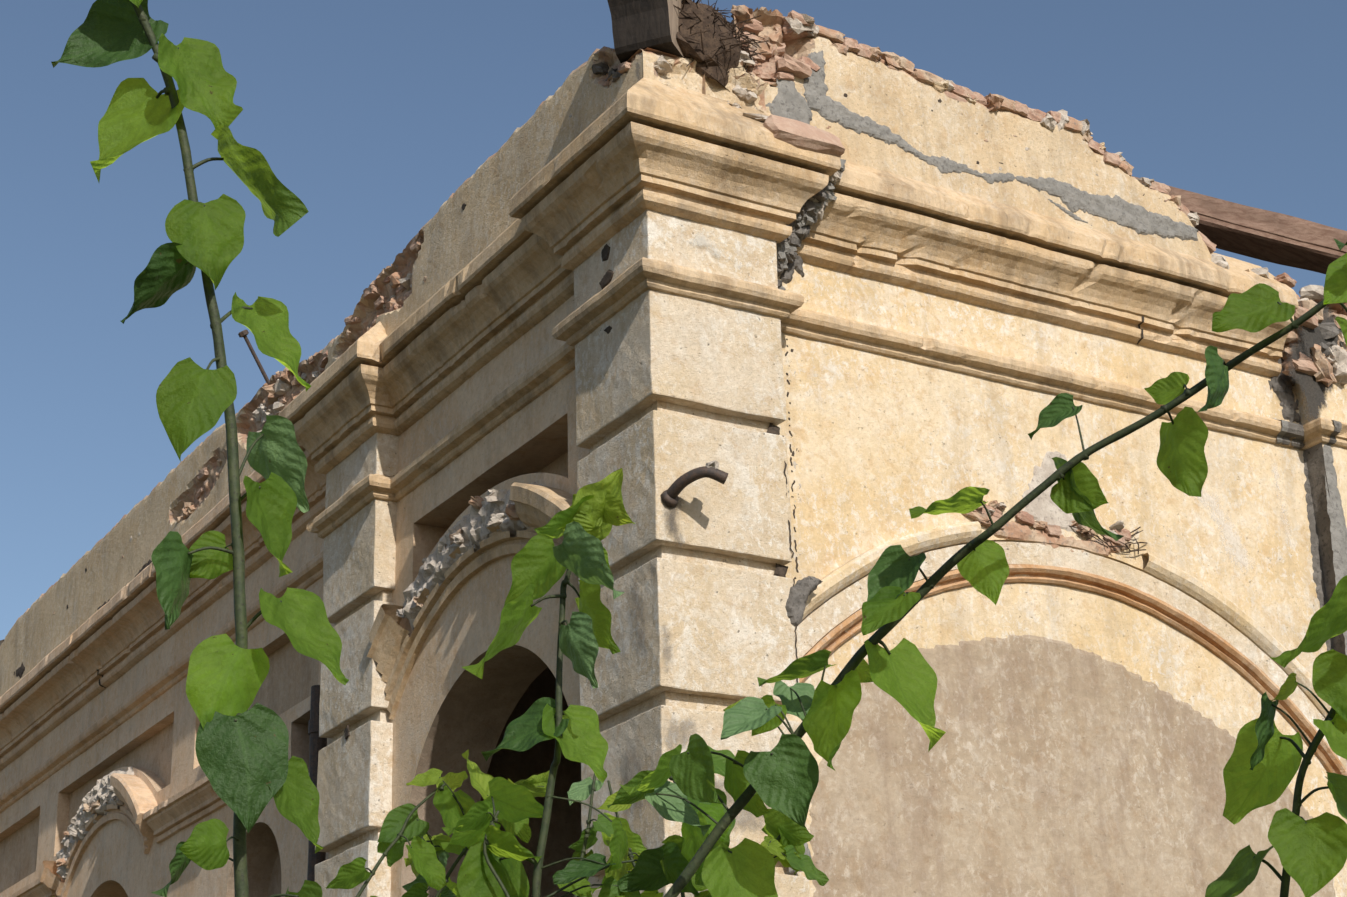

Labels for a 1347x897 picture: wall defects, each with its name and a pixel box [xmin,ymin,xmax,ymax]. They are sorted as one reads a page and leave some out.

flaking render [591,48,635,86]
flaking render [654,5,846,290]
crack [766,50,1198,241]
spalling [346,237,431,347]
spalling [239,350,328,437]
peeling [1309,322,1347,385]
spalling [172,450,227,523]
spalling [963,451,1147,556]
spalling [396,489,530,630]
spalling [56,766,134,880]